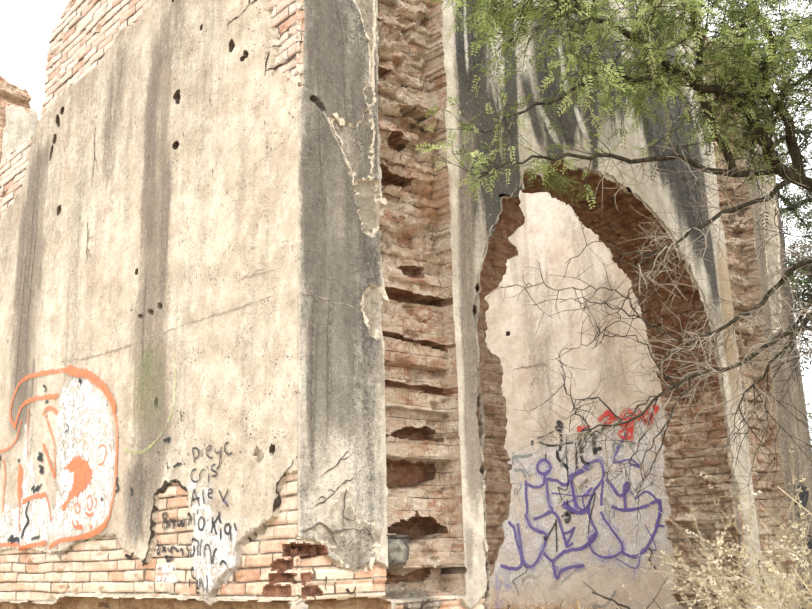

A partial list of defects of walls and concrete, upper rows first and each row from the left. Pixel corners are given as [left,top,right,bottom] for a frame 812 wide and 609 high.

water stain [12,145,48,435]
water stain [127,20,170,533]
spalling [0,0,486,609]
water stain [303,0,363,441]
spalling [476,197,525,576]